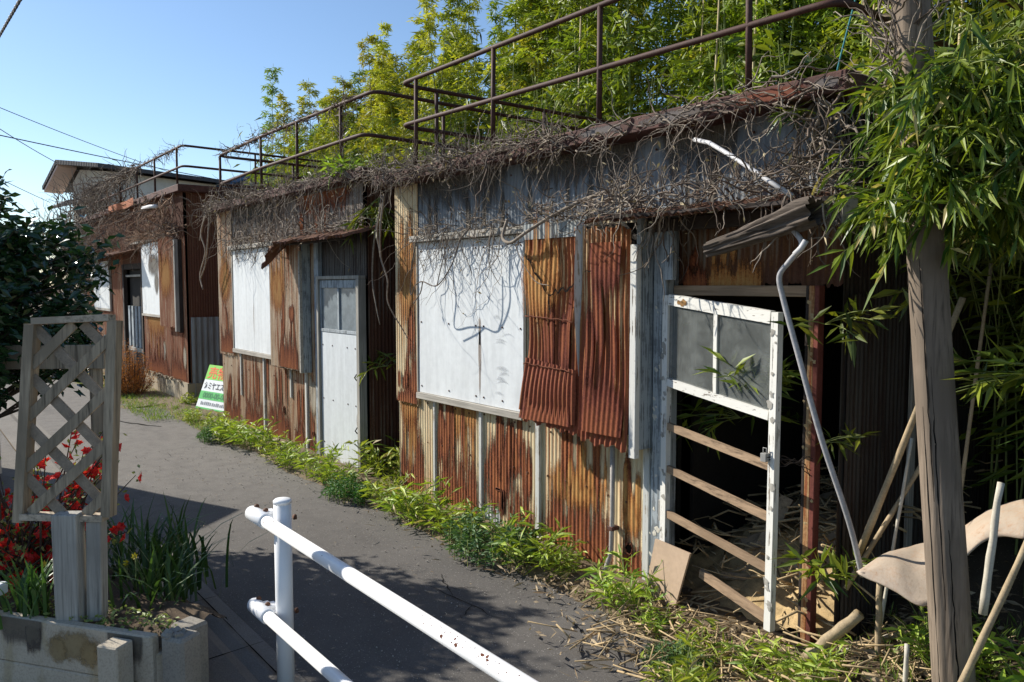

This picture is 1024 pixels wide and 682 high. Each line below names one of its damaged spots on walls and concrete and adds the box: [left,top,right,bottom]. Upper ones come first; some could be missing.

rust [159,247,173,298]
rust [147,317,188,382]
rust [219,234,233,353]
rust [224,251,317,452]
rust [397,210,424,492]
rust [437,241,642,578]
rust [521,210,572,387]
rust [683,246,763,286]